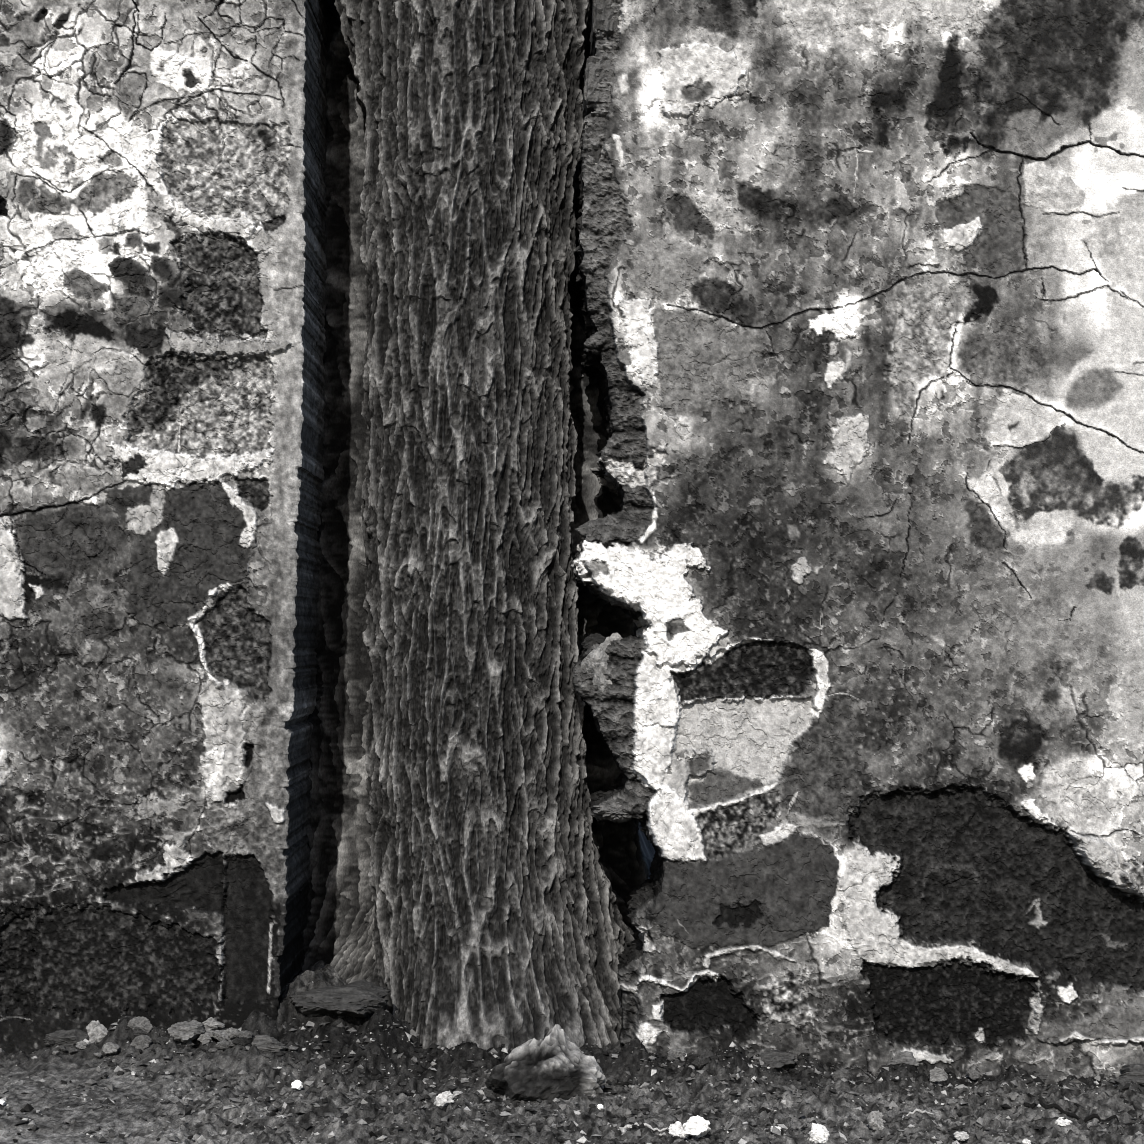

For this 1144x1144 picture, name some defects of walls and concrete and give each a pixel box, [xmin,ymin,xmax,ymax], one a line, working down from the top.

crack [117,0,304,121]
water stain [924,0,1144,158]
crack [11,125,158,202]
crack [25,220,147,255]
crack [676,124,1138,329]
peeling [618,297,660,388]
crack [0,481,127,576]
spalling [104,118,294,810]
water stain [1001,427,1144,594]
peeling [266,802,286,824]
spalling [574,448,1144,1067]
spalling [0,839,274,1024]